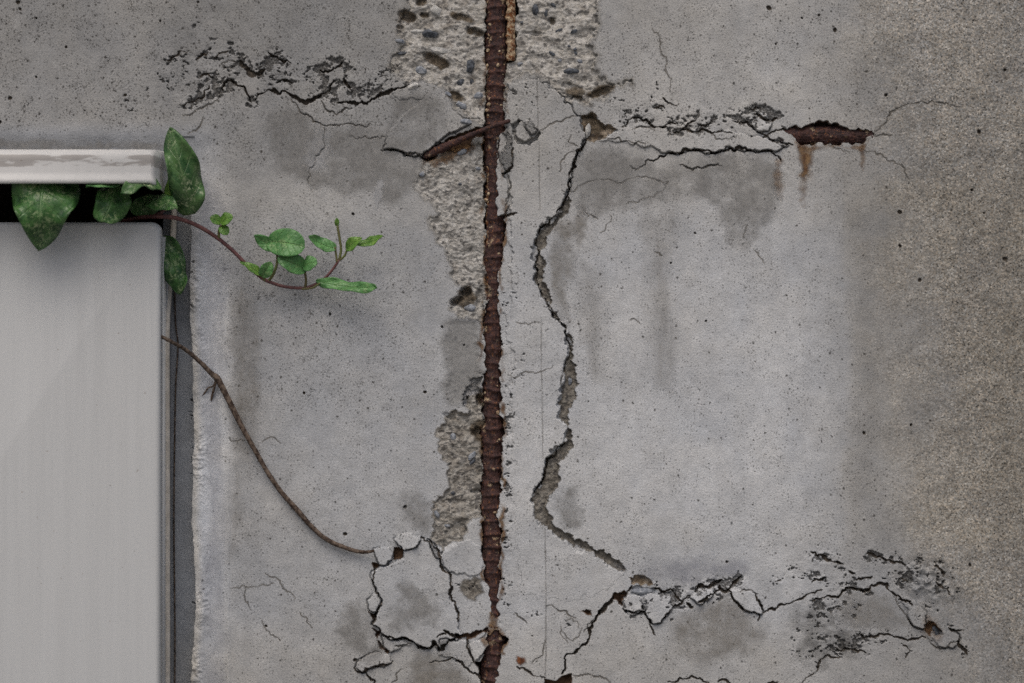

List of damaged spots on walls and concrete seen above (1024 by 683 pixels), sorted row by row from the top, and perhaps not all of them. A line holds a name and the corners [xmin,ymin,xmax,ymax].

crack [167,50,424,184]
spalling [388,0,514,321]
spalling [503,0,634,142]
rust [798,145,817,177]
crack [510,31,968,683]
crack [354,536,481,683]
rust [481,614,509,654]